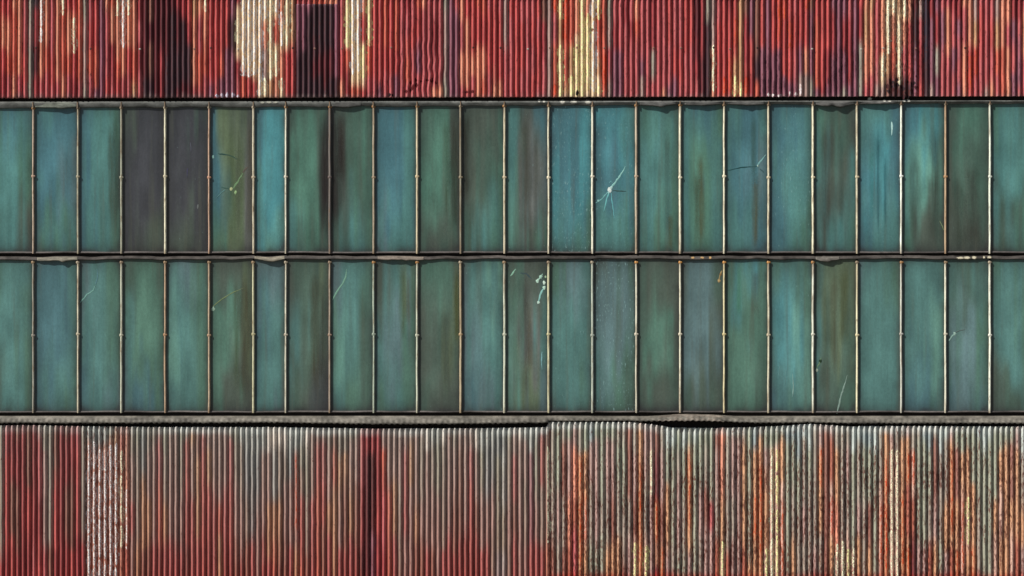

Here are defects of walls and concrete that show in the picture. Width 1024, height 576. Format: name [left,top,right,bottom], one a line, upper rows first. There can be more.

peeling [234,0,292,96]
peeling [556,0,602,97]
rust [886,75,919,99]
crack [596,166,626,218]
peeling [85,442,127,576]
rust [578,460,587,563]
rust [753,468,764,565]
rust [878,463,911,576]
rust [949,454,976,576]